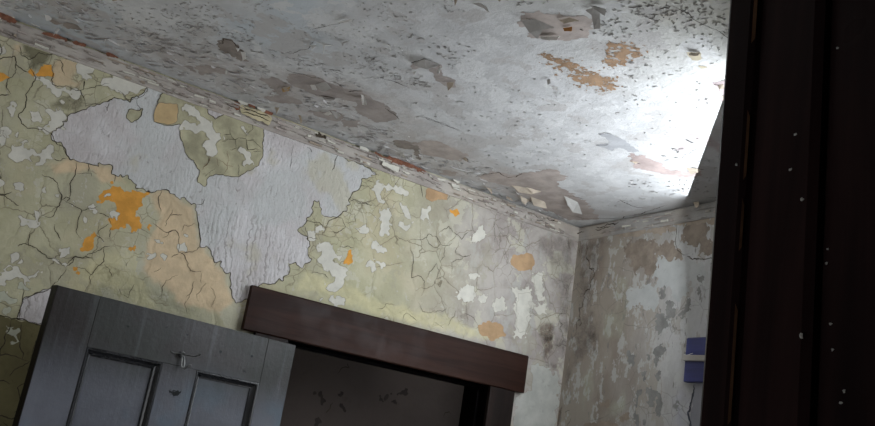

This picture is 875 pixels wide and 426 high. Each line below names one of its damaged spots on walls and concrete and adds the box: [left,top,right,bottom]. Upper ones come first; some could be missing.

peeling [517,5,606,41]
peeling [712,80,725,102]
crack [203,125,259,175]
crack [0,44,148,361]
crack [153,191,215,303]
crack [305,165,392,248]
peeling [0,15,716,426]
crack [410,226,470,283]
damp [540,324,553,355]
damp [576,269,635,355]
damp [663,376,695,426]